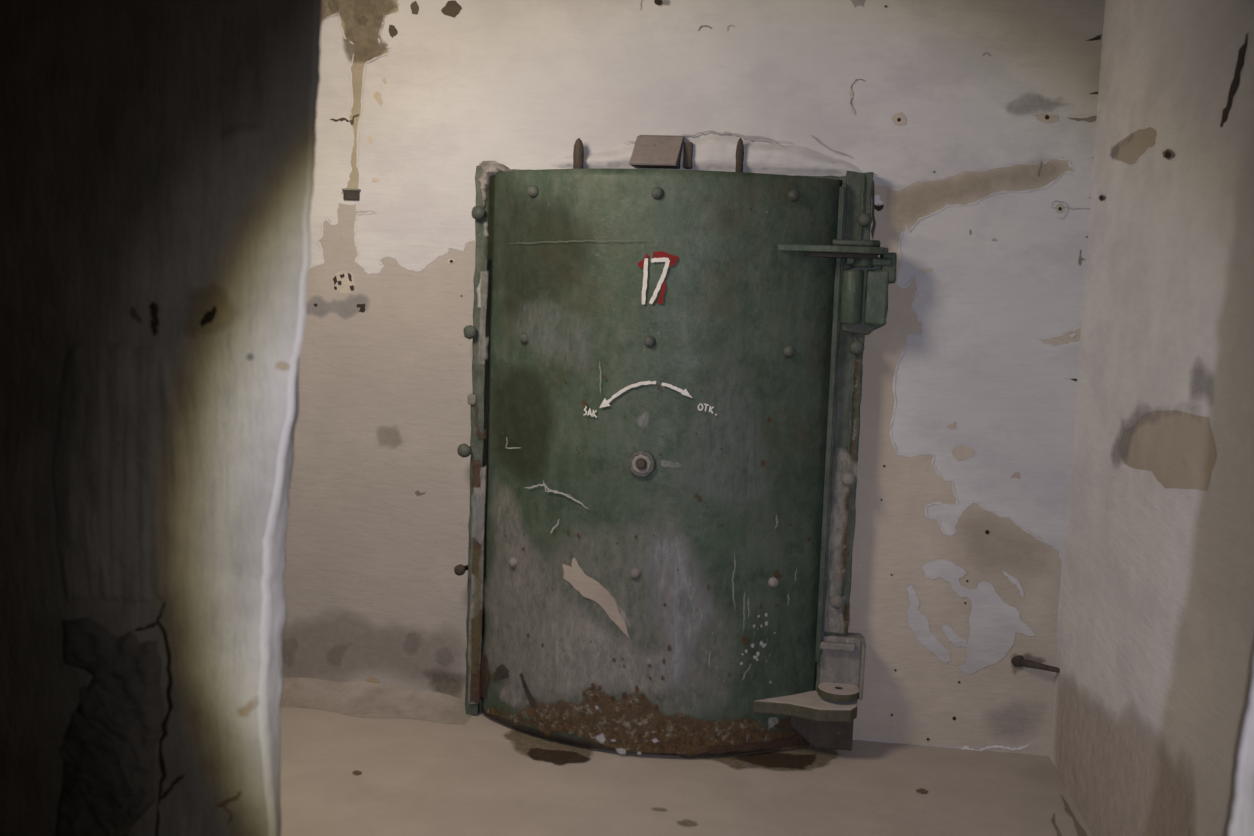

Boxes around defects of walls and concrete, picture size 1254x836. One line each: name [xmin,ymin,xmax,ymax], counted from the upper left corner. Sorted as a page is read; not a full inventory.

peeling [1109,127,1156,165]
flaking render [52,341,190,604]
peeling [282,0,476,700]
peeling [848,157,1081,755]
peeling [1113,410,1217,491]
crack [134,602,185,836]
crack [1051,795,1087,836]